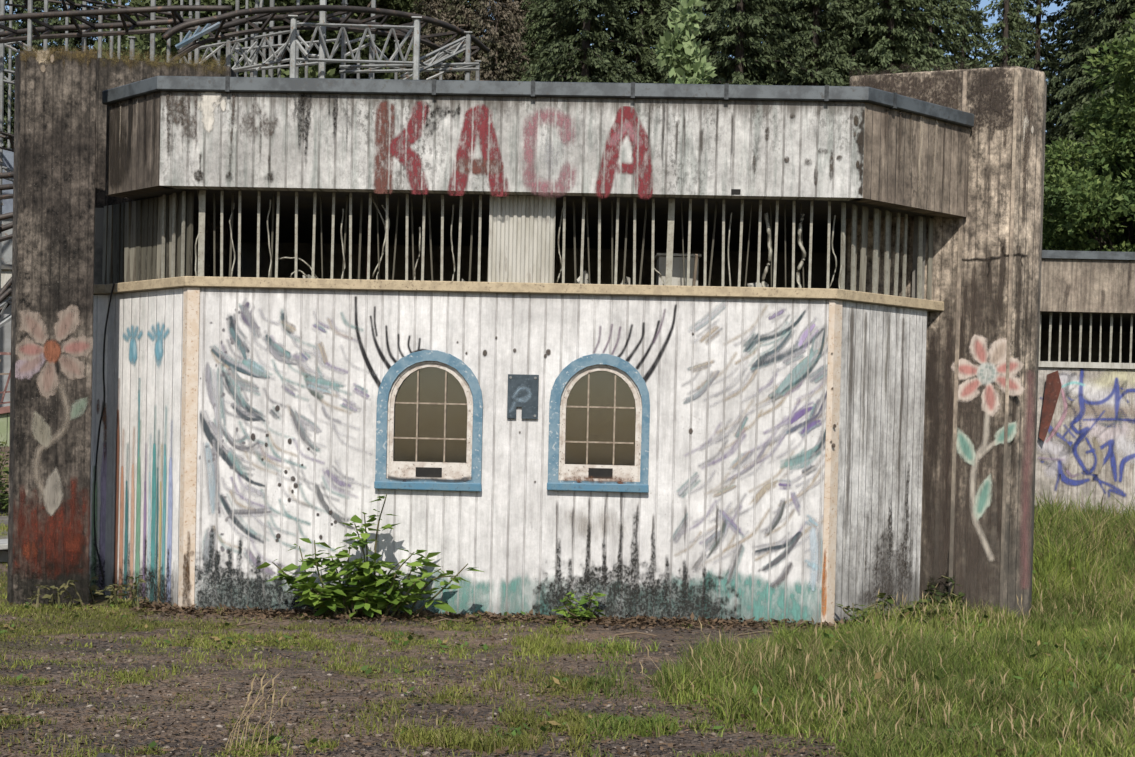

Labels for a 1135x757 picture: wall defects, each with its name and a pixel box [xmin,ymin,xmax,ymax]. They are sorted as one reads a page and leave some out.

damp [295,94,311,154]
damp [885,108,946,180]
damp [847,307,867,499]
damp [860,239,1029,611]